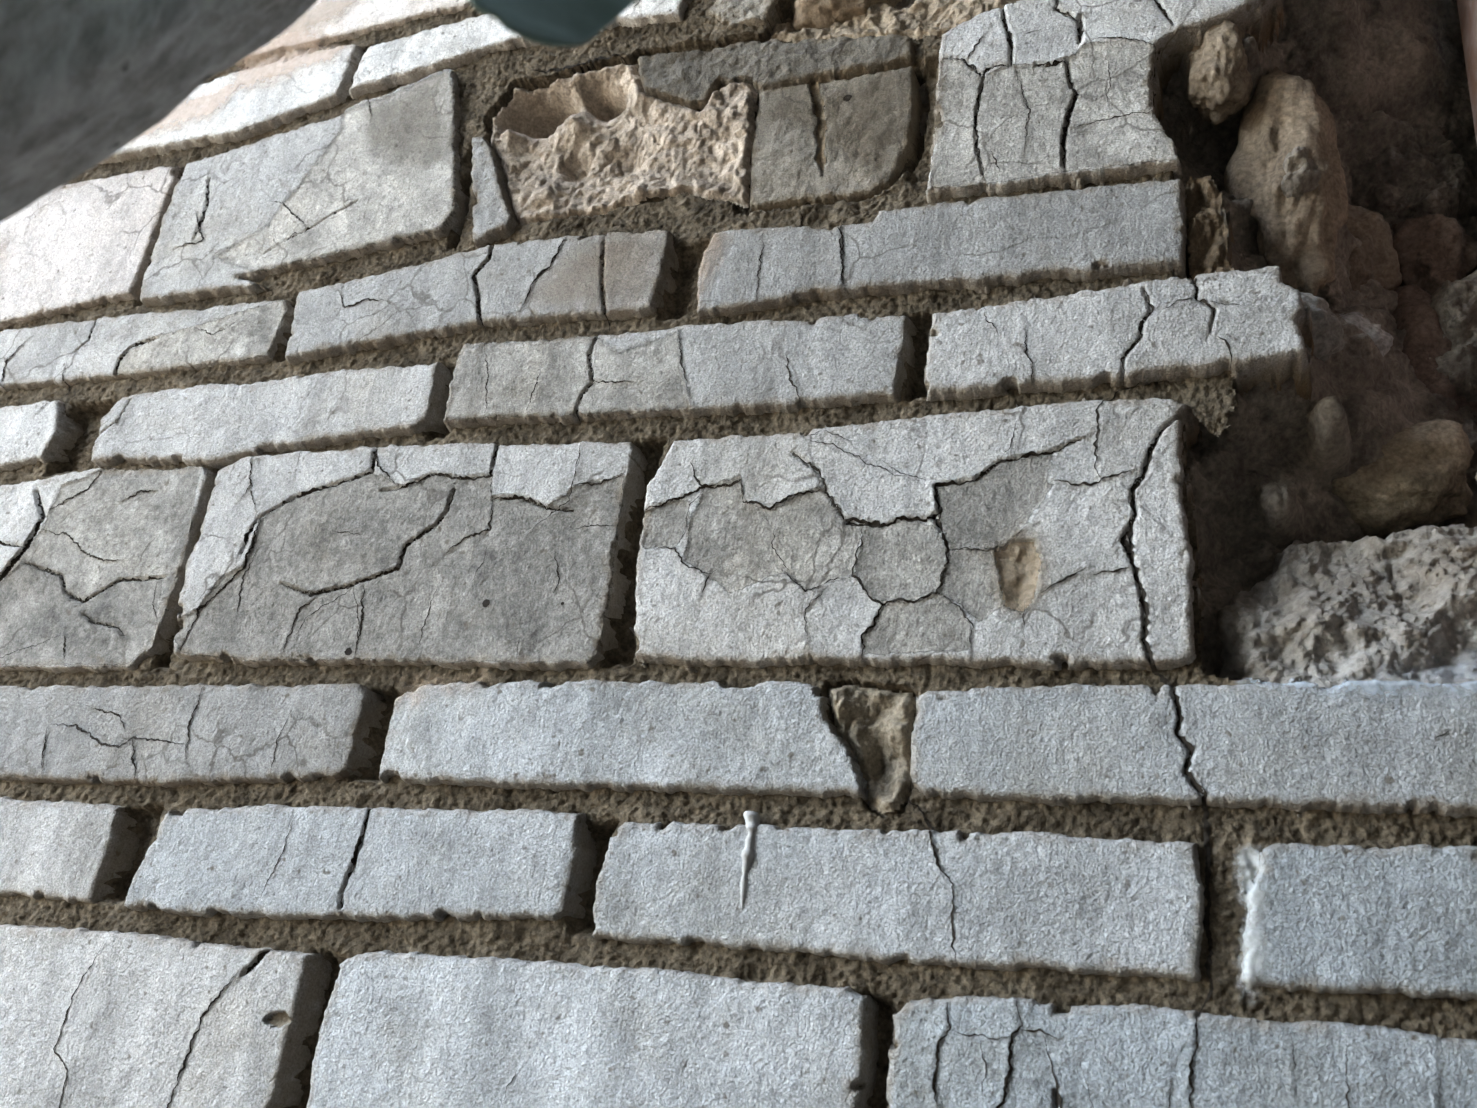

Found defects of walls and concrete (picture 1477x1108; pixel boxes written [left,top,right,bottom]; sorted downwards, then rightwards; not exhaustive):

spalling [491,64,758,225]
spalling [770,0,1022,44]
crack [946,0,1174,171]
spalling [1185,176,1234,280]
crack [179,232,630,657]
crack [0,473,164,658]
peeling [0,466,624,669]
peeling [640,455,1053,655]
spalling [828,685,917,813]
crack [646,251,1249,1108]
crack [340,809,371,908]
crack [167,951,270,1108]